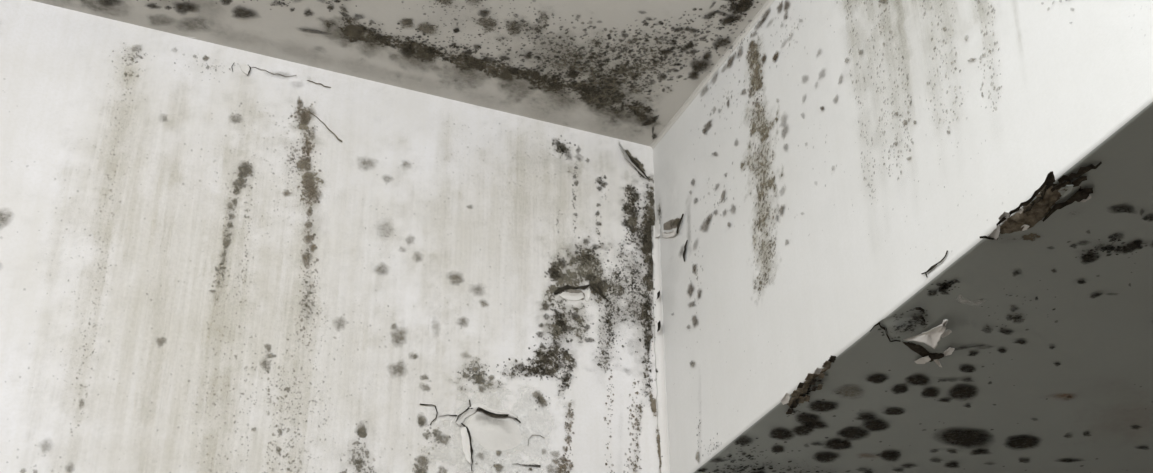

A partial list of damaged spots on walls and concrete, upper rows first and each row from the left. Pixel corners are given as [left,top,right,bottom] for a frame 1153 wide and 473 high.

damp [221,0,258,18]
damp [270,0,789,291]
damp [210,163,252,292]
spalling [979,162,1102,241]
damp [458,176,662,473]
damp [687,265,701,328]
peeling [903,319,955,367]
damp [927,280,960,296]
damp [1068,231,1153,286]
spalling [780,355,836,416]
damp [932,421,1005,468]
damp [1006,436,1038,471]